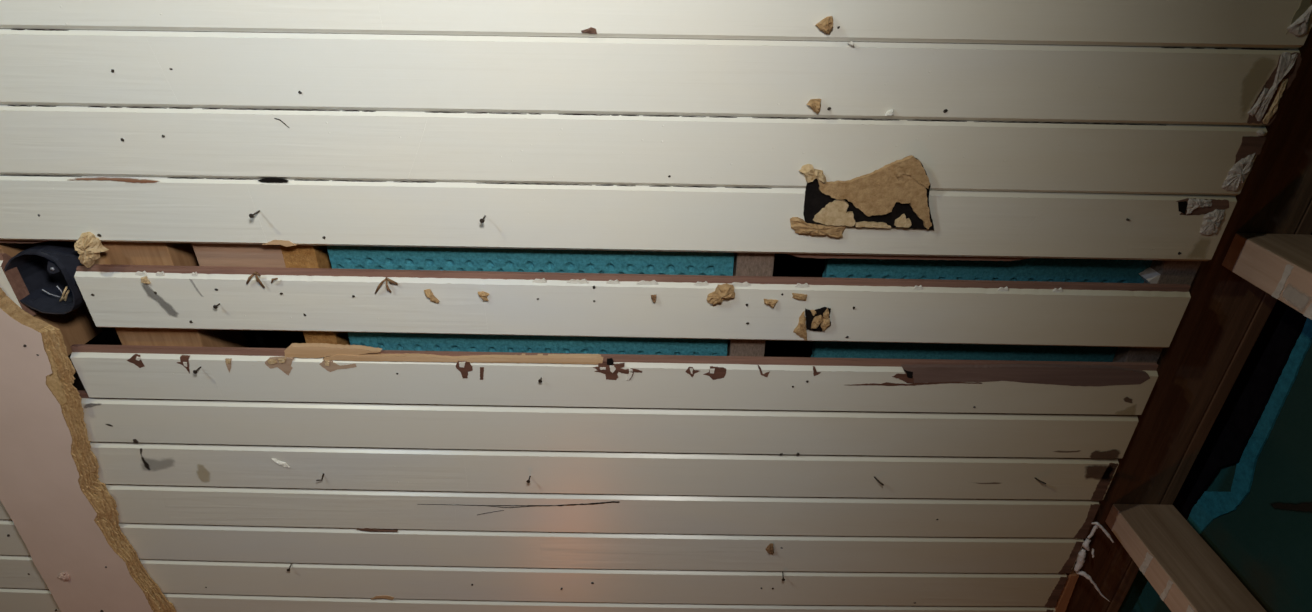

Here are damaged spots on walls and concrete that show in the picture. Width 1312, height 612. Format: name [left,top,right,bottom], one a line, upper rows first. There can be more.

peeling [1176,0,1312,236]
crack [0,172,82,180]
crack [171,174,259,182]
crack [301,177,436,185]
crack [478,182,771,190]
spalling [127,354,144,368]
spalling [176,355,190,374]
spalling [265,356,294,376]
peeling [46,349,67,405]